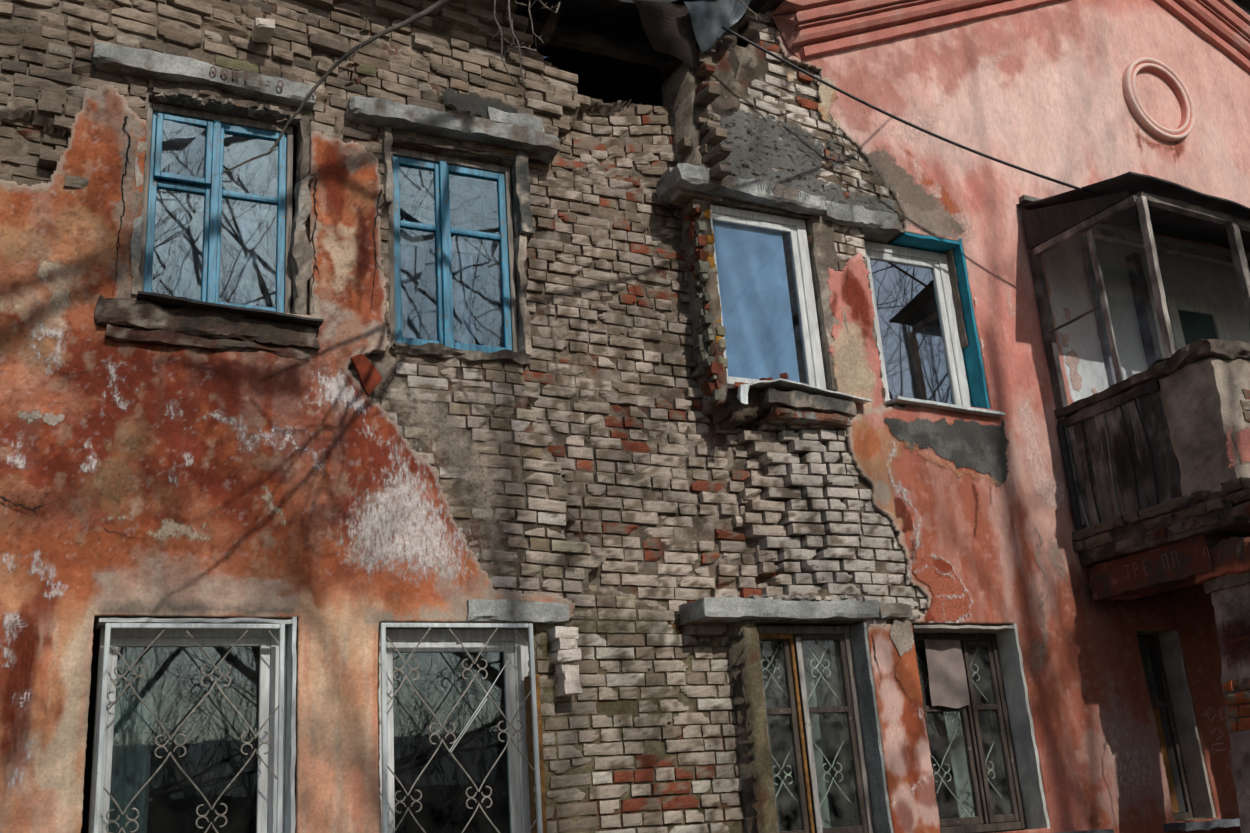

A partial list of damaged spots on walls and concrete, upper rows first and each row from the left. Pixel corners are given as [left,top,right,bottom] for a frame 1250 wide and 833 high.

crack [112,116,132,297]
leakage [158,357,301,394]
leakage [205,414,297,451]
leakage [318,372,372,437]
spalling [0,0,972,833]
leakage [341,446,463,575]
leakage [32,551,63,597]
leakage [4,613,23,667]
spalling [1223,677,1250,732]